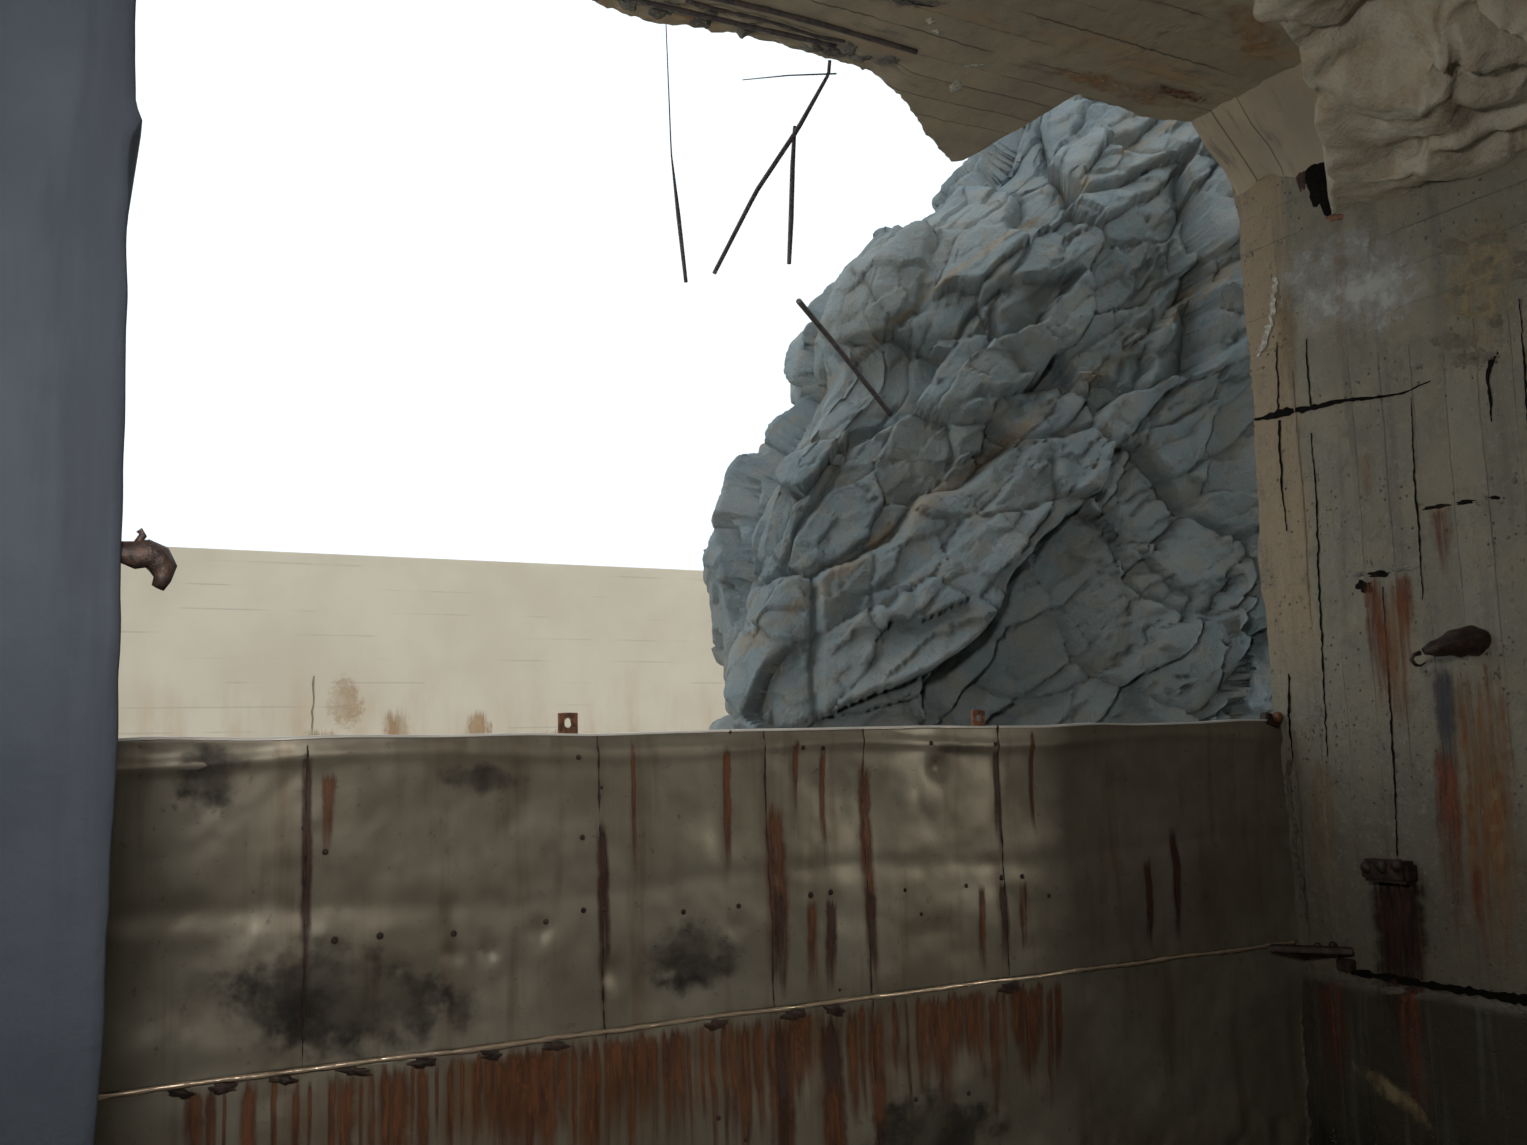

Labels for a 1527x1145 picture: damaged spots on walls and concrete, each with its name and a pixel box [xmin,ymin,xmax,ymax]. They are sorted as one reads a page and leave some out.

crack [1486,299,1527,422]
crack [1254,339,1431,760]
crack [1382,587,1398,857]
rust [598,825,610,970]
rust [166,982,1062,1145]
rust [723,749,731,854]
rust [766,810,788,979]
rust [808,901,837,979]
rust [859,763,877,969]
rust [993,752,1001,838]
rust [979,884,1027,955]
crack [1351,969,1527,1013]